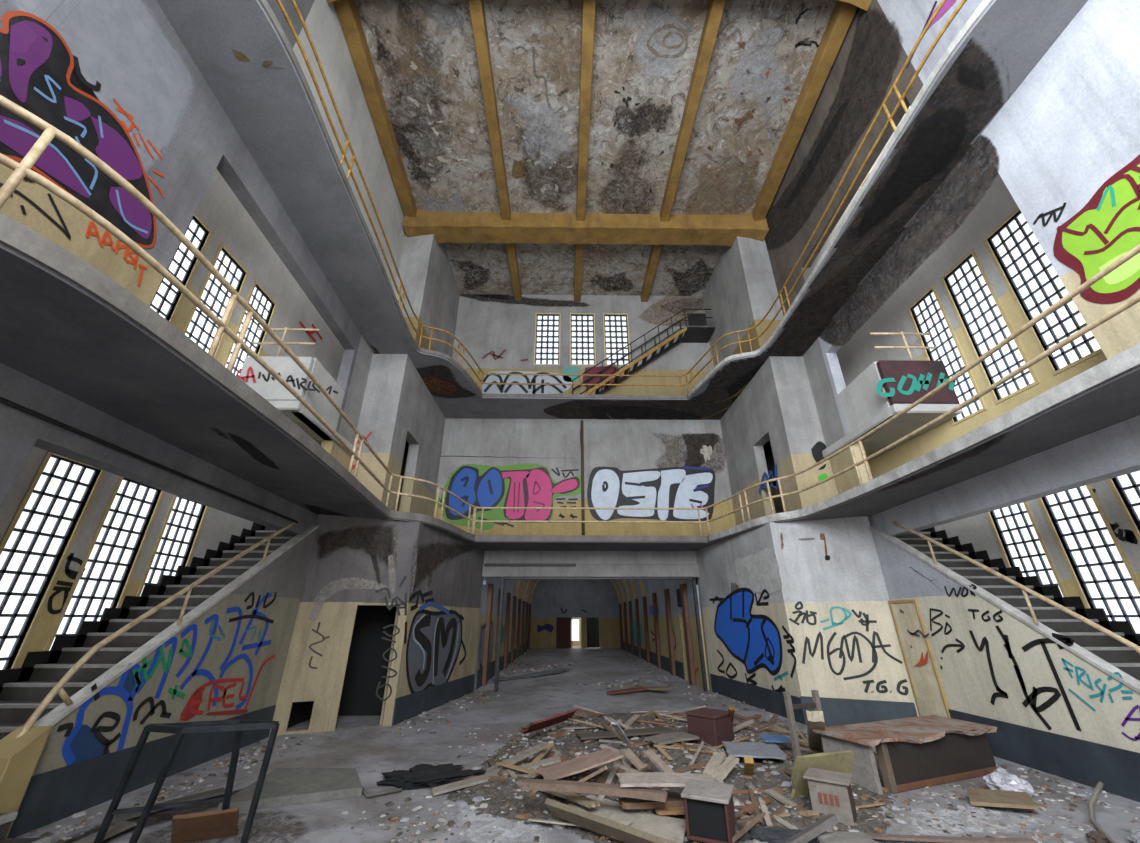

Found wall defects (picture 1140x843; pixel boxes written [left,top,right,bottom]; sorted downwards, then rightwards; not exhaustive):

damp [765,9,901,250]
damp [783,40,1003,355]
damp [451,260,589,307]
damp [591,273,634,291]
damp [639,259,714,326]